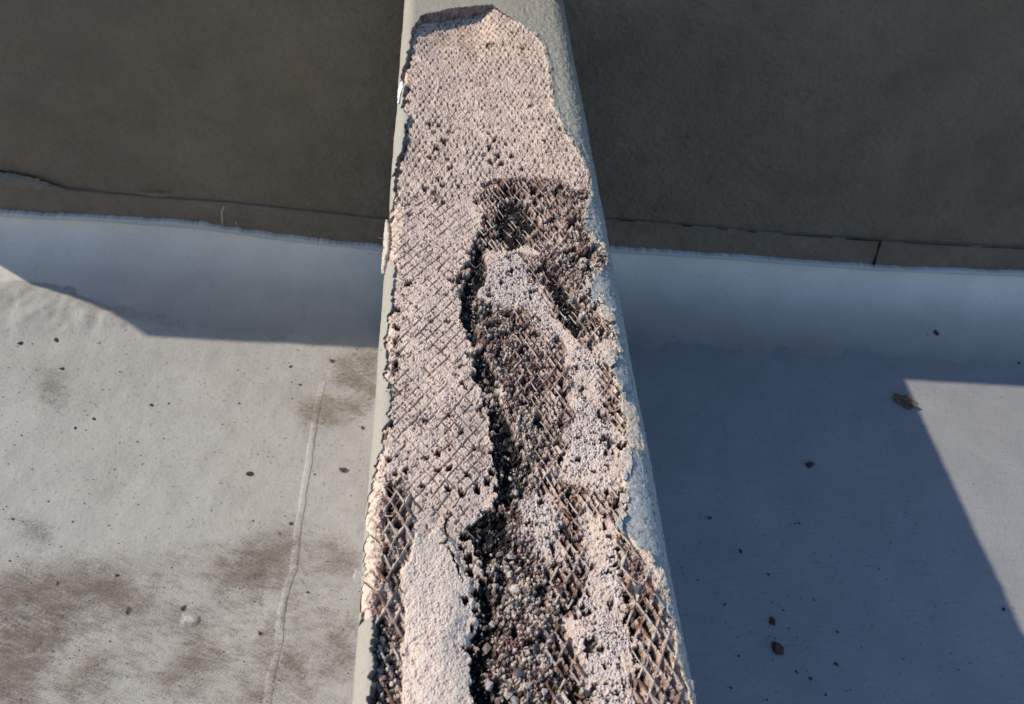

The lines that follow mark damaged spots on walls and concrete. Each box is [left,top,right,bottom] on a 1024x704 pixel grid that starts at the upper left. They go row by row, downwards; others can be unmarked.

flaking render [361,9,696,704]